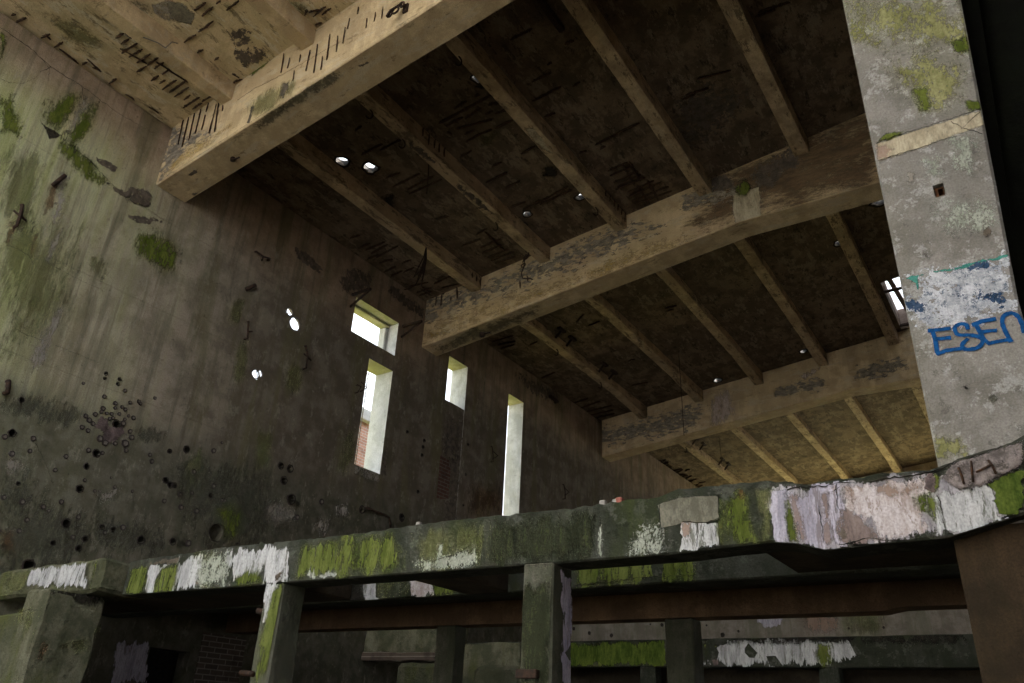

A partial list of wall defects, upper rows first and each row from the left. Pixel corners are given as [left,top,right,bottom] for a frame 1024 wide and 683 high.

spalling [152,0,239,43]
spalling [226,28,269,84]
spalling [280,6,383,98]
spalling [2,429,36,457]
spalling [76,372,157,493]
spalling [924,442,1024,492]
spalling [22,559,36,569]